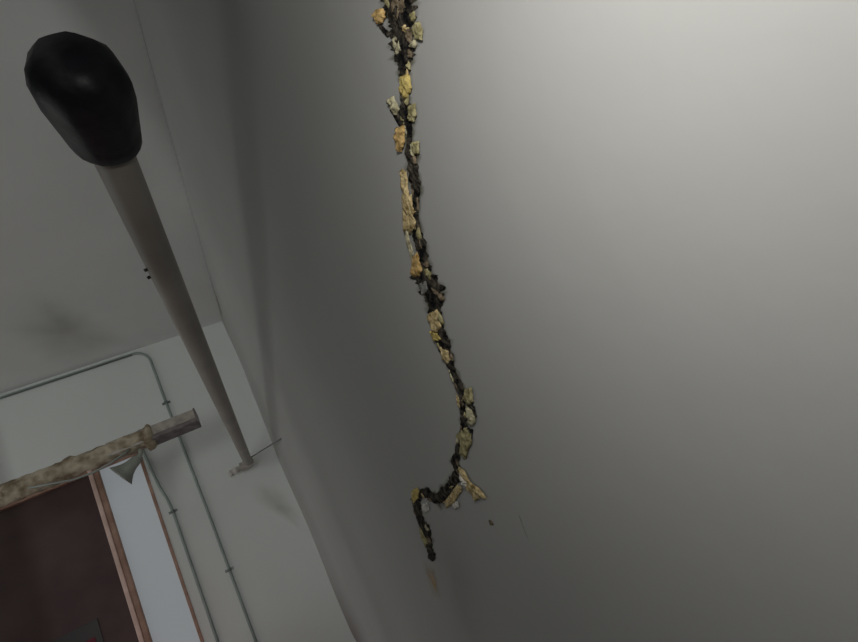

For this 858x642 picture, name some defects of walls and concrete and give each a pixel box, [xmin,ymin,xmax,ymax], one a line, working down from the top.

crack [371,0,487,561]